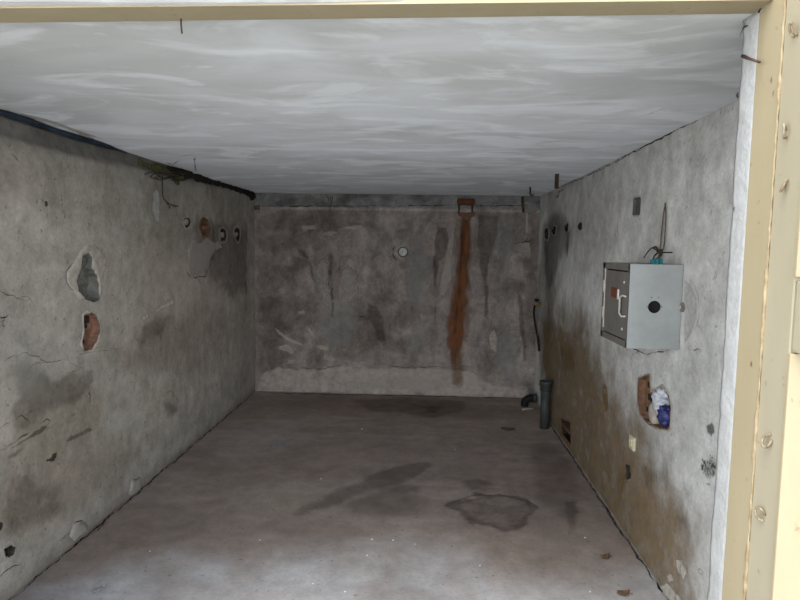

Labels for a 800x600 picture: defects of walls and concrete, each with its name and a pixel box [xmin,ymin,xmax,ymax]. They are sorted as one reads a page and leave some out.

flaking render [66,244,106,352]
peeling [182,216,241,291]
corrosion [447,217,470,362]
flaking render [637,373,673,430]
damp [542,317,686,600]